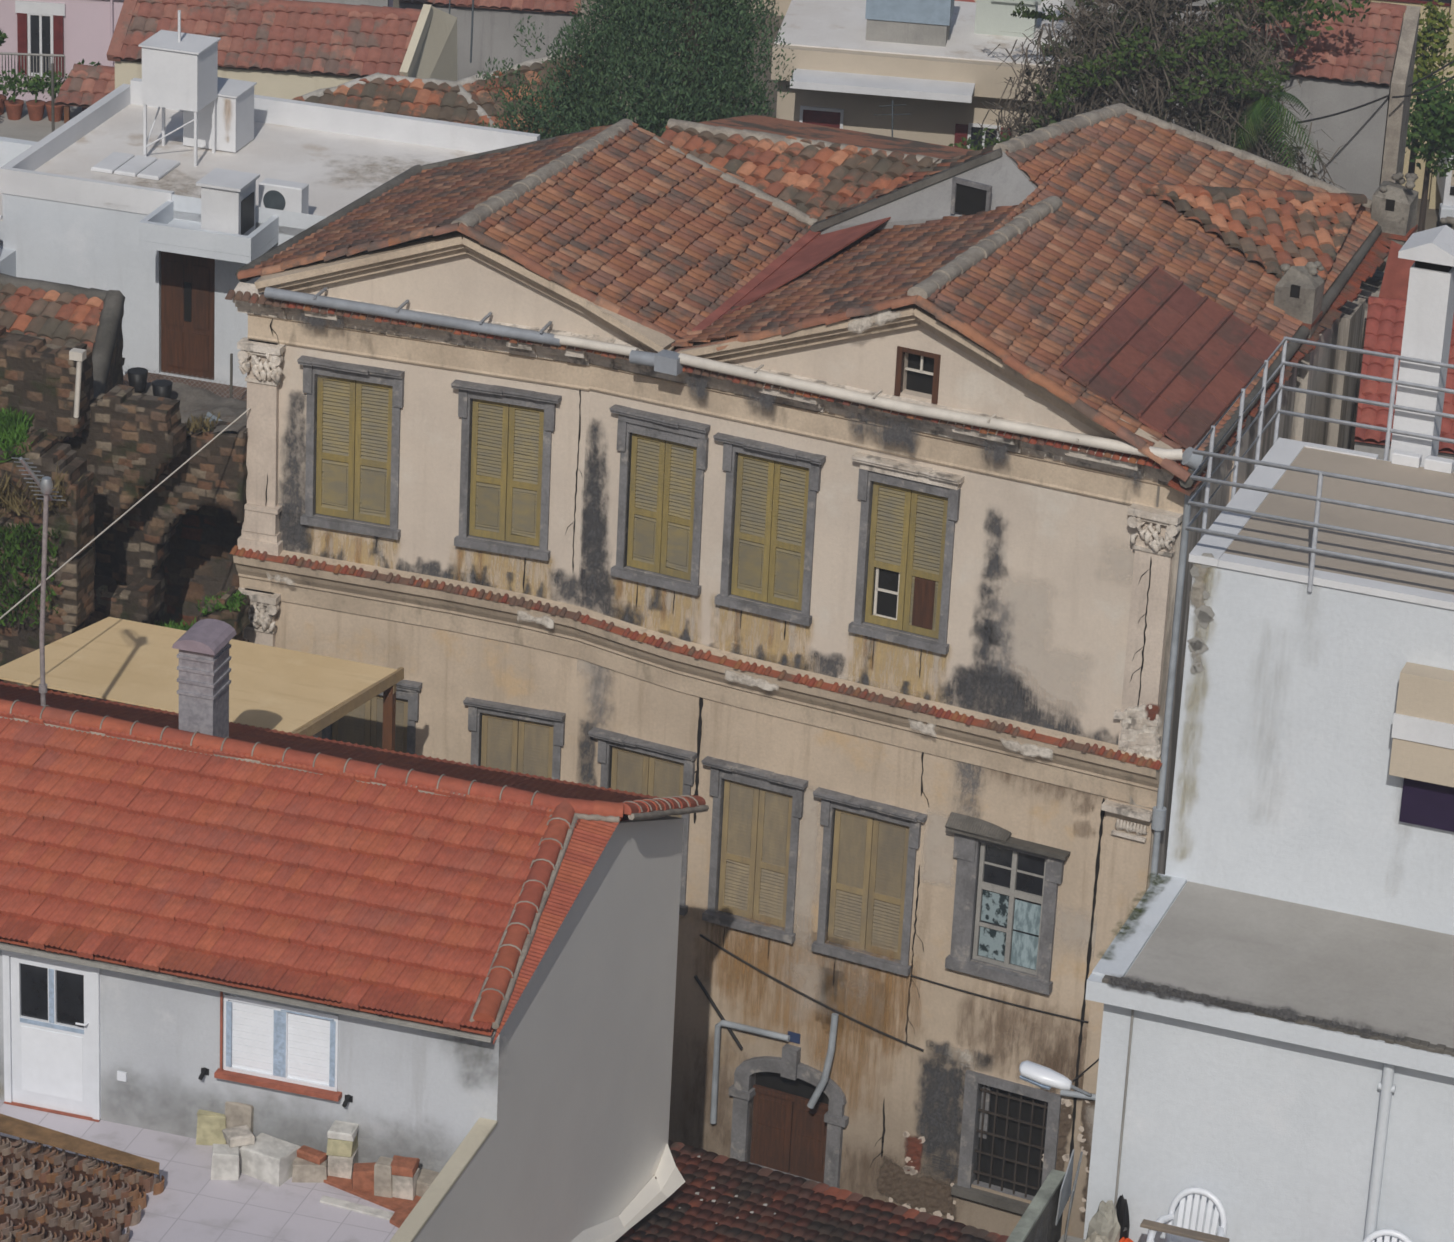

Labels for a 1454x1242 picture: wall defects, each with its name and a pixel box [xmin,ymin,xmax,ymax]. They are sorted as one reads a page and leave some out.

leakage [279,393,311,554]
leakage [581,423,614,616]
leakage [518,611,554,628]
leakage [941,512,1119,745]
crack [1129,559,1152,708]
crack [694,697,703,824]
leakage [1001,740,1053,758]
mould [1108,976,1404,1040]
leakage [917,1004,1086,1182]
spalling [1041,1098,1095,1222]